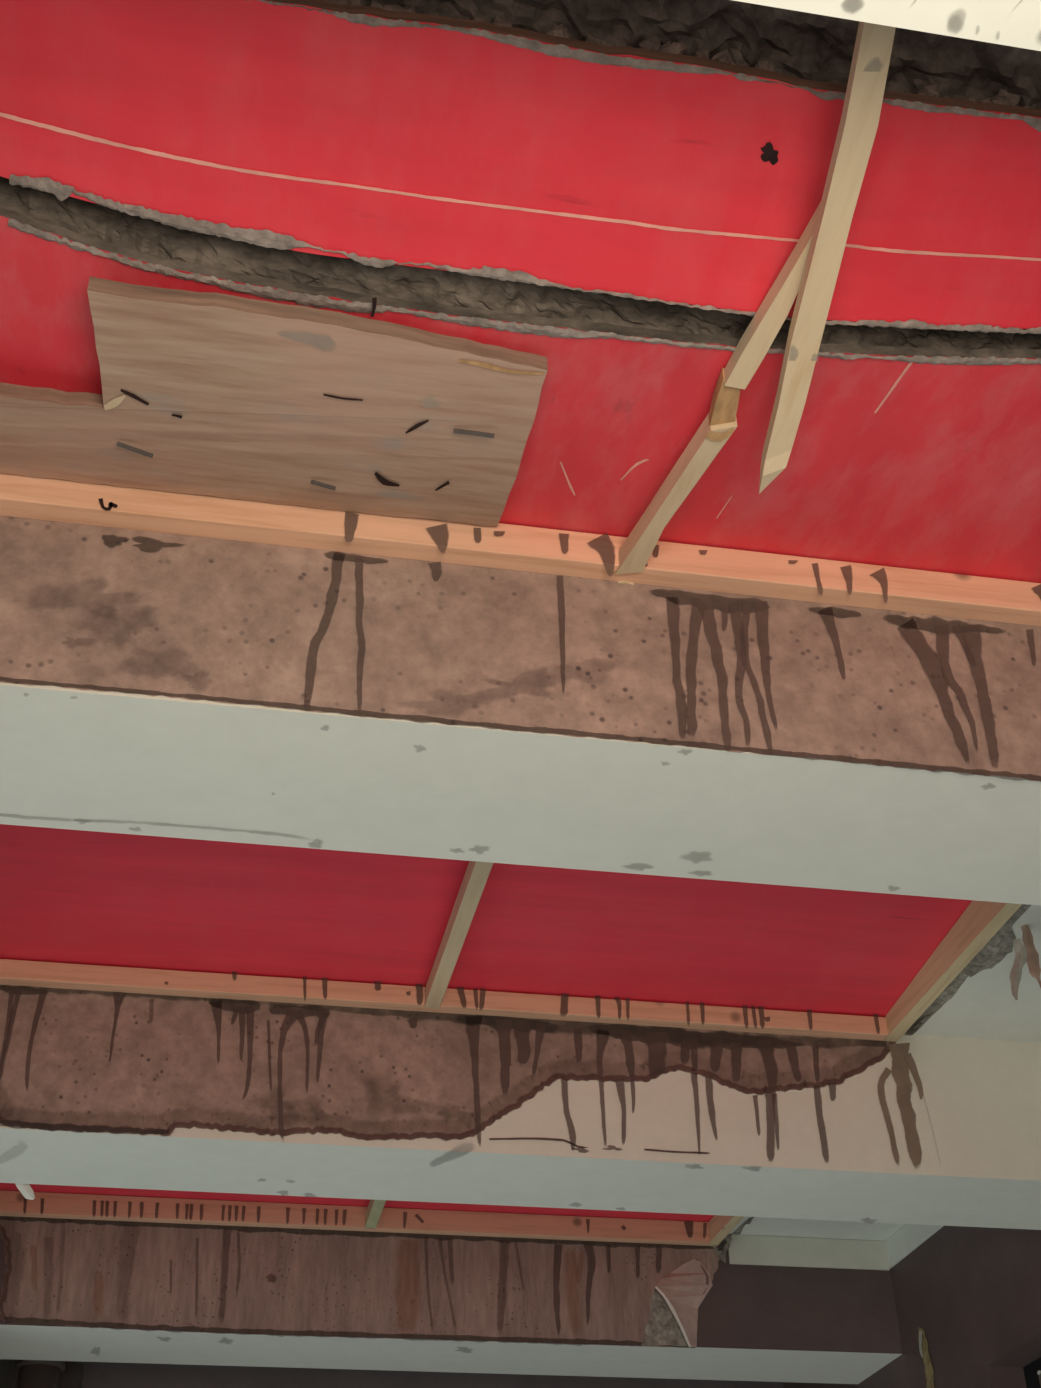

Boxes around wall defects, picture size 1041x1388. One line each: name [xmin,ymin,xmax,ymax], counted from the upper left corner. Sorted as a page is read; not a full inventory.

spalling [362,0,859,82]
spalling [885,27,1041,109]
spalling [0,176,754,338]
leakage [304,551,388,711]
flaking render [0,515,1041,781]
leakage [652,589,777,750]
leakage [886,615,1004,765]
leakage [209,998,330,1138]
flaking render [0,905,1041,1141]
leakage [561,1024,836,1162]
leakage [878,1043,923,1167]
flaking render [0,1216,754,1348]